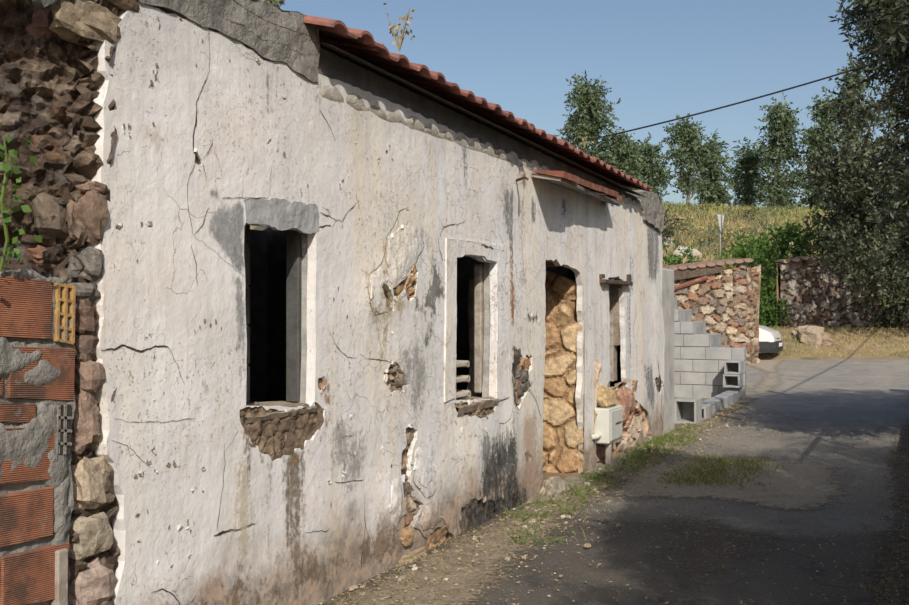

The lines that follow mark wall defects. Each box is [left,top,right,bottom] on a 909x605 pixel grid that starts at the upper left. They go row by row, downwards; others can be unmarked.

crack [187,28,271,278]
leakage [209,202,244,347]
crack [332,208,405,362]
spalling [382,265,418,311]
crack [102,344,184,383]
spalling [239,378,326,462]
spalling [384,360,409,396]
spalling [494,347,532,409]
leakage [282,452,340,597]
spalling [388,424,422,528]
leakage [460,426,527,535]
leakage [226,577,280,605]